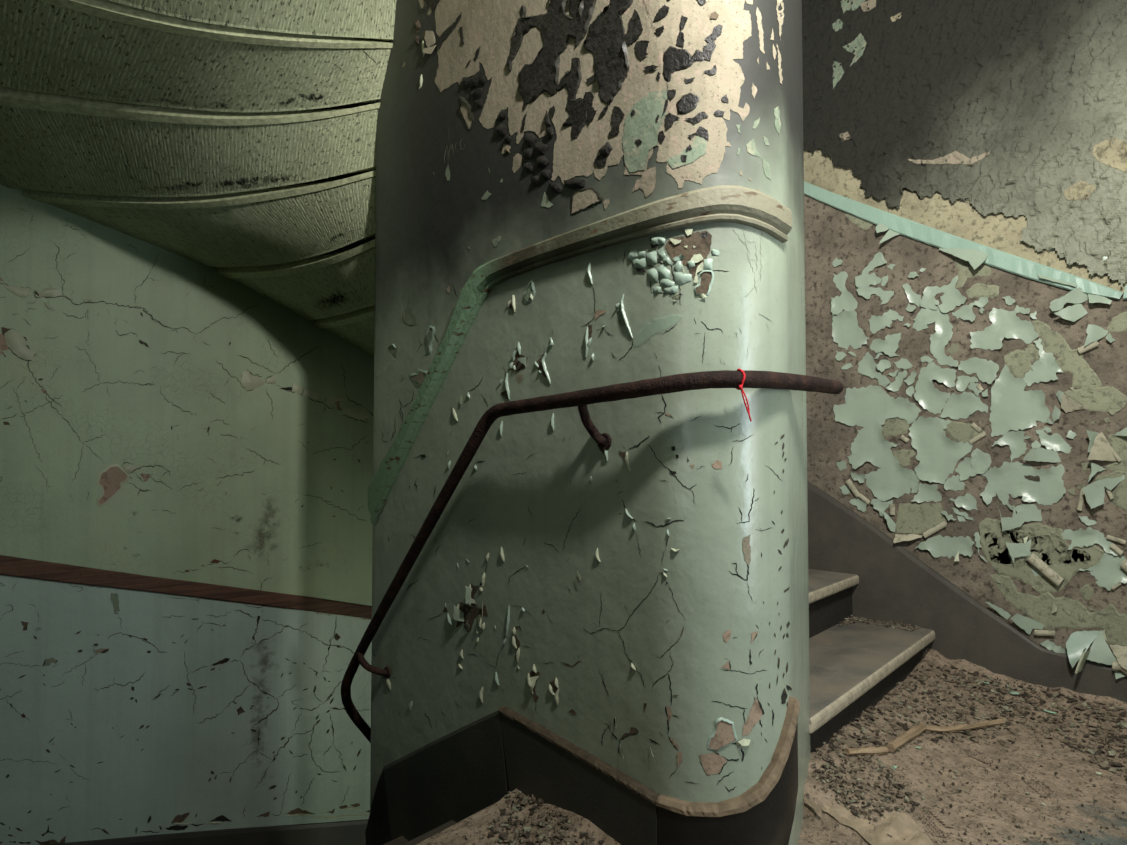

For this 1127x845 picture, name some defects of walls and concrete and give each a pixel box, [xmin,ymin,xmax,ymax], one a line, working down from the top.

peeling [414,0,784,215]
peeling [833,33,866,89]
peeling [832,0,876,31]
peeling [694,270,714,299]
crack [295,377,488,567]
crack [528,312,783,555]
peeling [831,213,1127,674]
crack [0,583,371,813]
crack [503,565,531,646]
crack [545,576,684,704]
crack [729,563,752,599]
peeling [699,587,792,775]